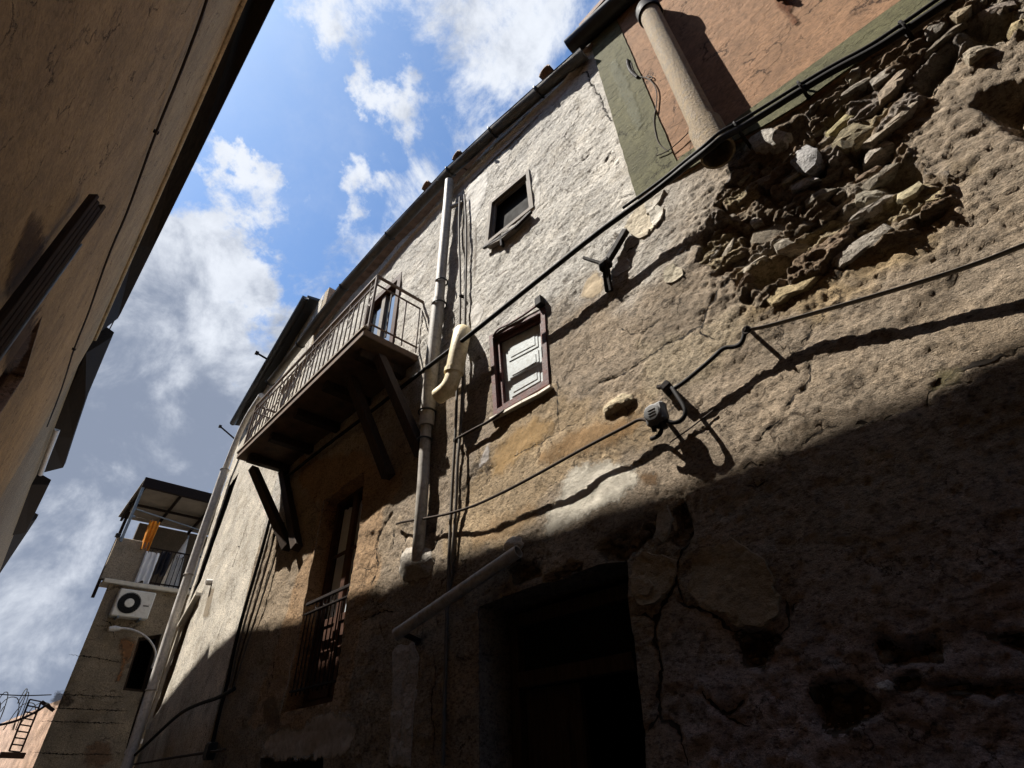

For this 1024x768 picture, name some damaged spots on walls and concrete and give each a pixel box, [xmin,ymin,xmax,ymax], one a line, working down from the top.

spalling [699,0,1024,308]
crack [635,543,748,764]